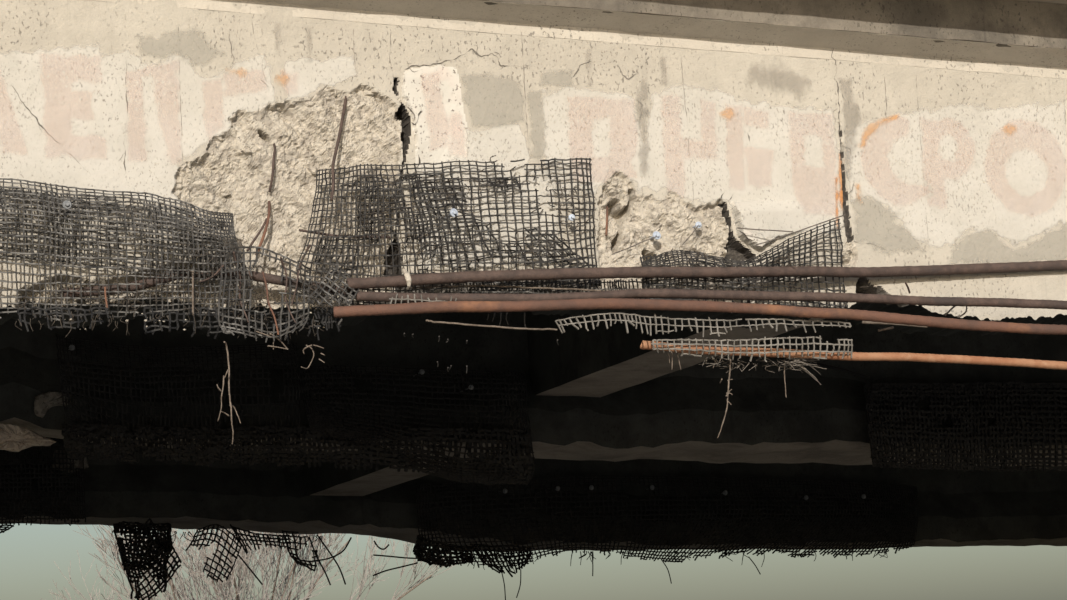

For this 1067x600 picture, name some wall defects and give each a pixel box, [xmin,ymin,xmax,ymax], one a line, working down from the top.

crack [383,34,529,275]
peeling [0,46,1067,312]
crack [831,48,887,250]